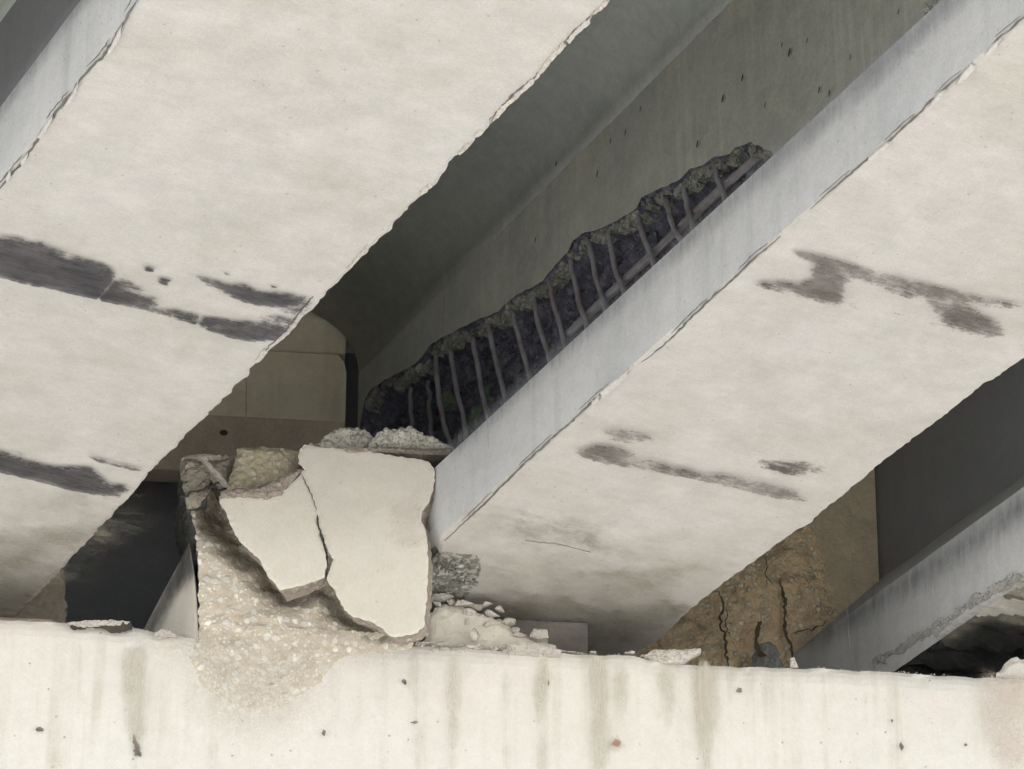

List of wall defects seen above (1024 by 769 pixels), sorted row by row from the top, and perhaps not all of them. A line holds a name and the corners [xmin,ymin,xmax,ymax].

spalling [458,0,610,155]
spalling [254,297,313,362]
spalling [309,142,773,468]
leakage [760,252,1014,337]
leakage [580,431,807,501]
spalling [431,546,481,605]
peeling [507,642,561,658]
crack [718,591,731,667]
crack [763,555,827,663]
spalling [872,573,1024,678]